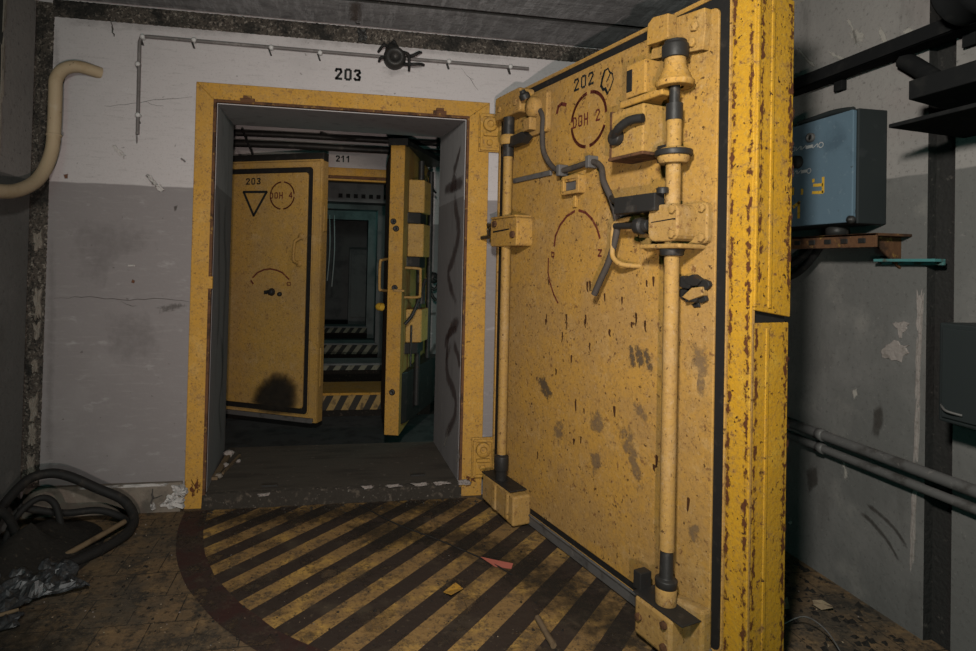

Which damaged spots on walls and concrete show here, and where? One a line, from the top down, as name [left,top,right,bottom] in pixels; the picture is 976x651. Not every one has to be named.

rust [786,4,795,299]
spalling [32,287,43,340]
rust [727,0,766,651]
spalling [26,392,38,475]
spalling [106,483,189,510]
rust [723,384,732,599]